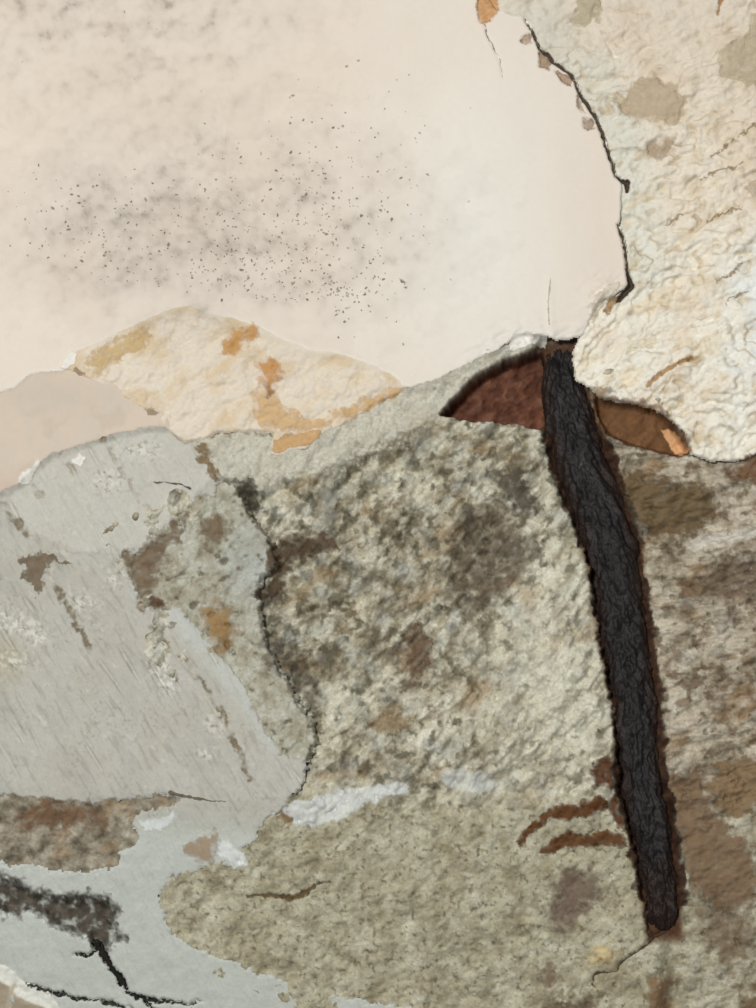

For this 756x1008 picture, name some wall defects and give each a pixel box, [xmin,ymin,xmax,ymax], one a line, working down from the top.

crack [477,0,500,59]
crack [520,19,630,193]
crack [603,224,634,315]
corrosion [541,431,577,521]
flaking render [496,0,756,873]
crack [646,356,694,388]
spalling [0,306,756,1008]
corrosion [516,756,648,902]
crack [0,879,200,1008]